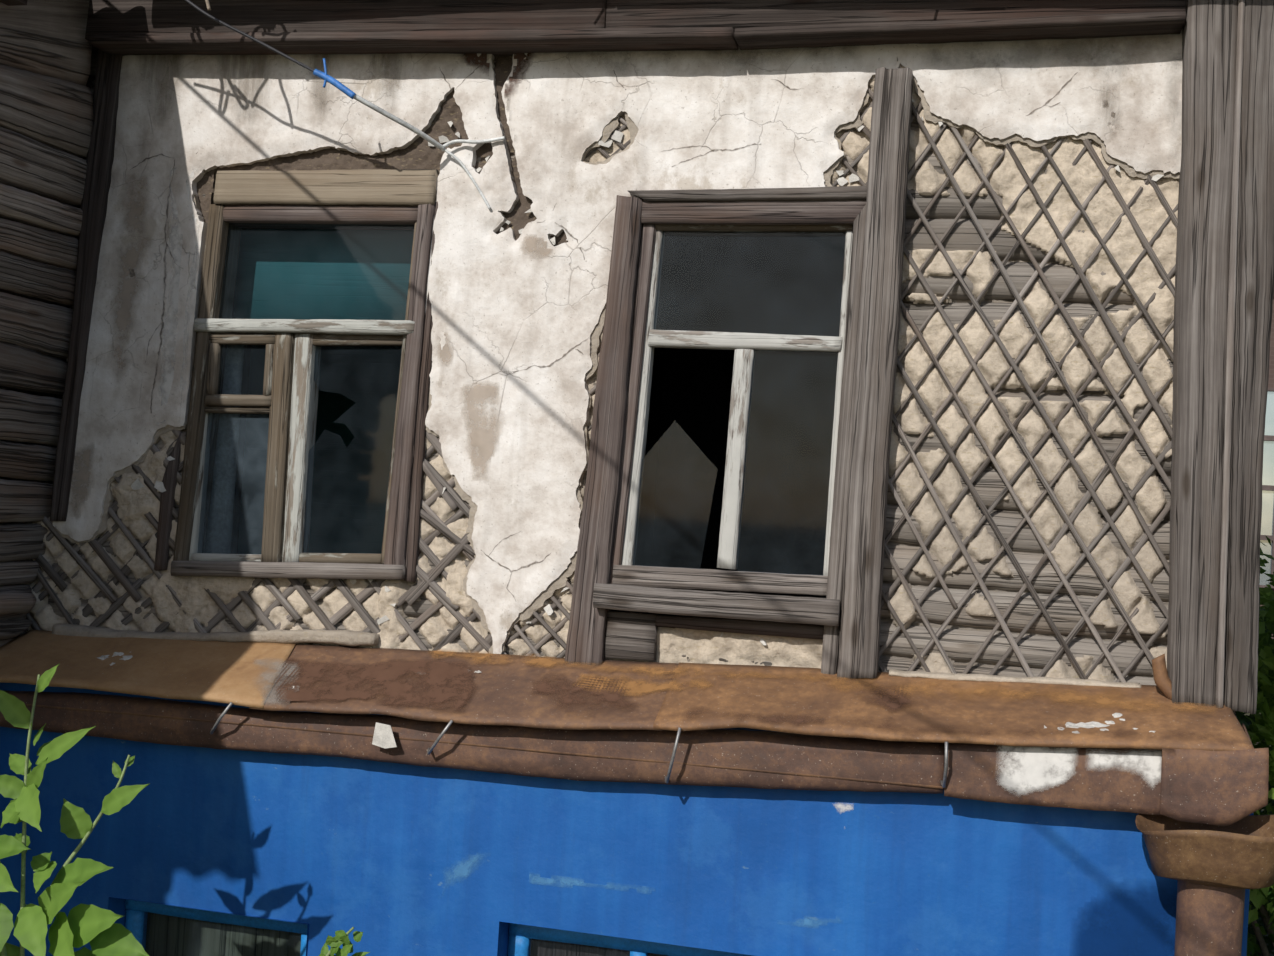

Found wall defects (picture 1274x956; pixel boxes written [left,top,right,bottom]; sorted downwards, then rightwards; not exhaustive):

flaking render [197,55,537,240]
flaking render [585,114,631,164]
crack [664,143,755,167]
flaking render [825,80,875,187]
crack [133,152,198,413]
flaking render [878,83,1179,683]
flaking render [15,430,575,658]
rust [275,650,506,710]
rust [577,666,710,695]
flaking render [605,627,823,668]